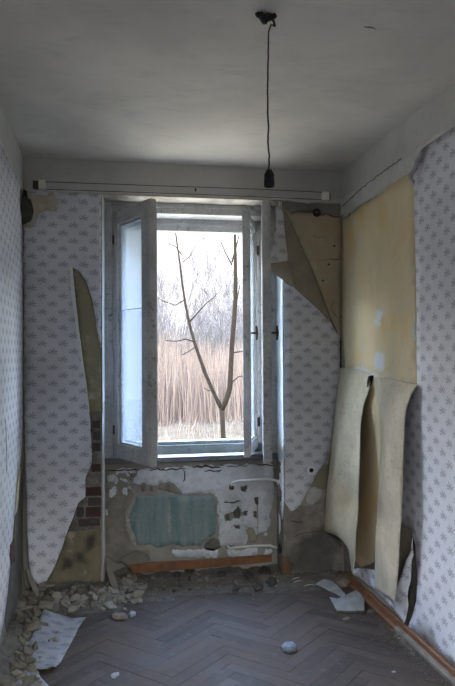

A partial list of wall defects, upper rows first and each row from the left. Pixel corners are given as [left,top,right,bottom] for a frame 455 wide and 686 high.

crack [290,158,402,218]
peeling [45,268,342,584]
peeling [275,174,417,568]